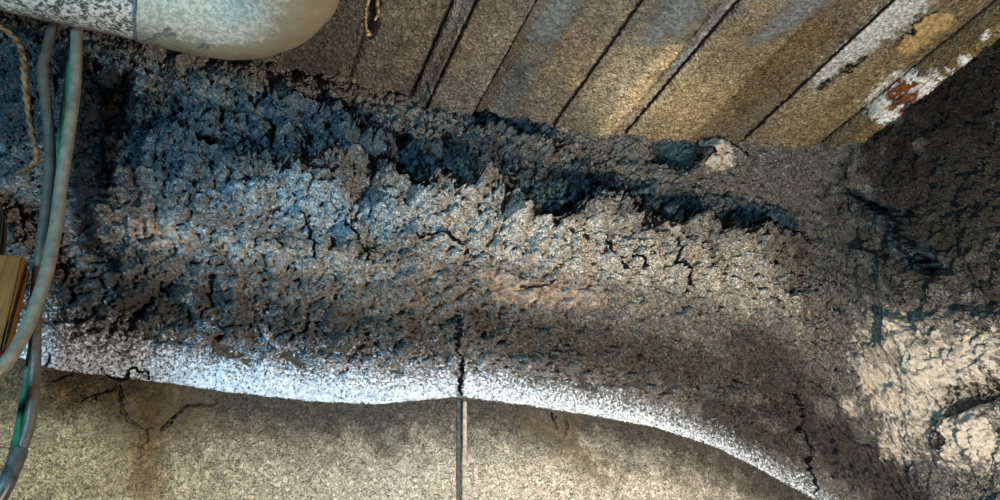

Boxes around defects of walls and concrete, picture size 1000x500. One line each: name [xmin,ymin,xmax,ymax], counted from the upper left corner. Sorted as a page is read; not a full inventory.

rust [884,78,924,115]
crack [165,89,811,288]
spalling [651,137,737,175]
crack [453,314,471,397]
crack [81,366,220,444]
crack [792,373,820,497]